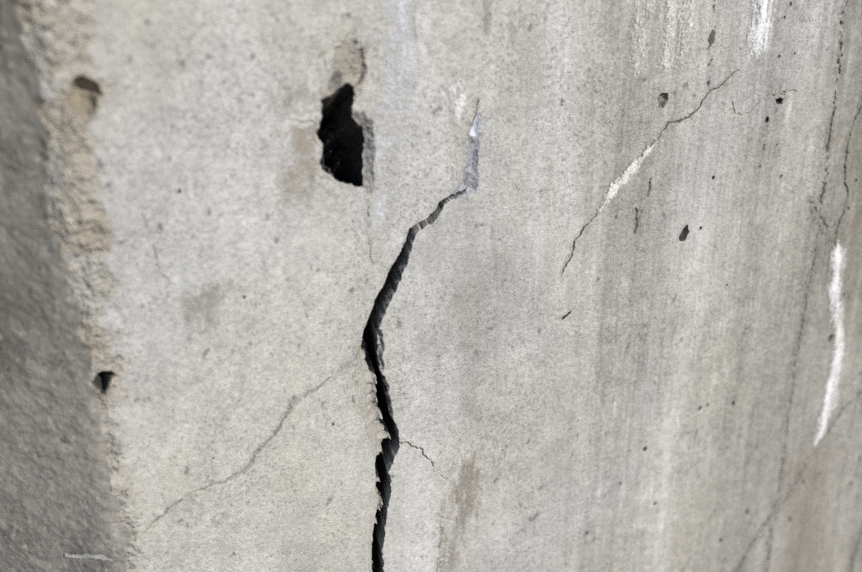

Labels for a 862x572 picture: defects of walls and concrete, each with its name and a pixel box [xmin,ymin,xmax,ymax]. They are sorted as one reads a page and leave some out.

hole [285,30,378,266]
water stain [632,0,655,77]
water stain [660,0,695,71]
crack [558,68,799,279]
water stain [748,0,773,57]
crack [805,0,862,247]
crack [136,91,484,572]
efflorescence [815,241,845,446]
crack [735,392,862,572]